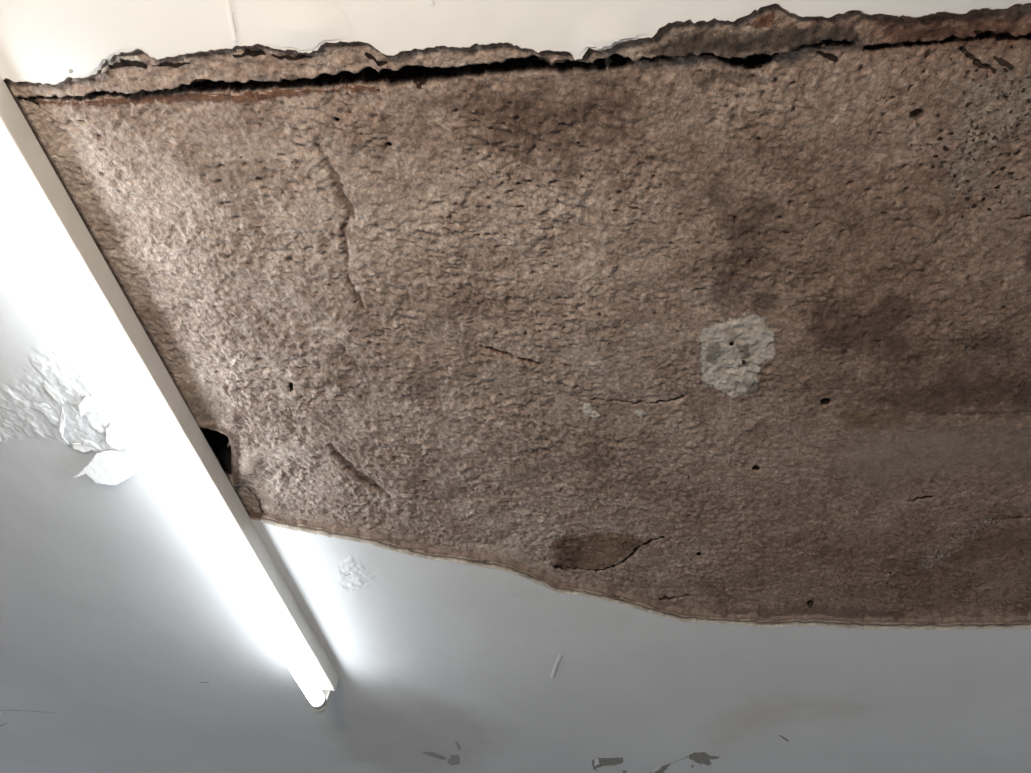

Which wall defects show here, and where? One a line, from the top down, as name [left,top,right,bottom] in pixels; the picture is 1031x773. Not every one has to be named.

crack [19,0,1031,105]
spalling [580,3,1031,63]
spalling [3,36,1031,630]
crack [553,536,665,572]
peeling [591,758,627,773]
peeling [650,752,720,773]